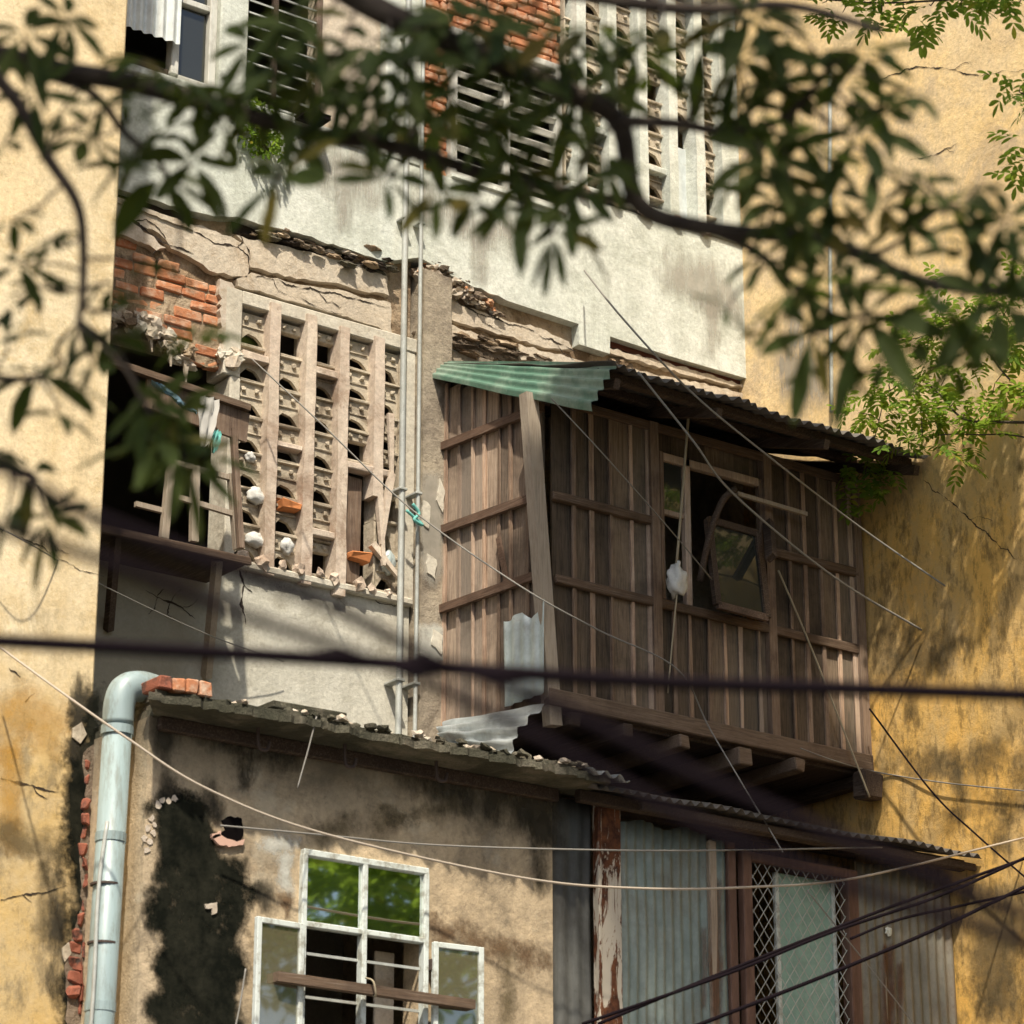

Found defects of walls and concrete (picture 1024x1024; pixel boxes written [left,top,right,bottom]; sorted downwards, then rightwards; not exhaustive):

crack [886,62,1023,78]
flaking render [111,224,246,373]
crack [135,219,383,314]
crack [925,481,1024,567]
crack [147,590,194,618]
crack [1,778,54,799]
crack [1,885,66,903]
spalling [61,722,94,1024]
water stain [142,726,300,1024]
spalling [210,816,245,848]